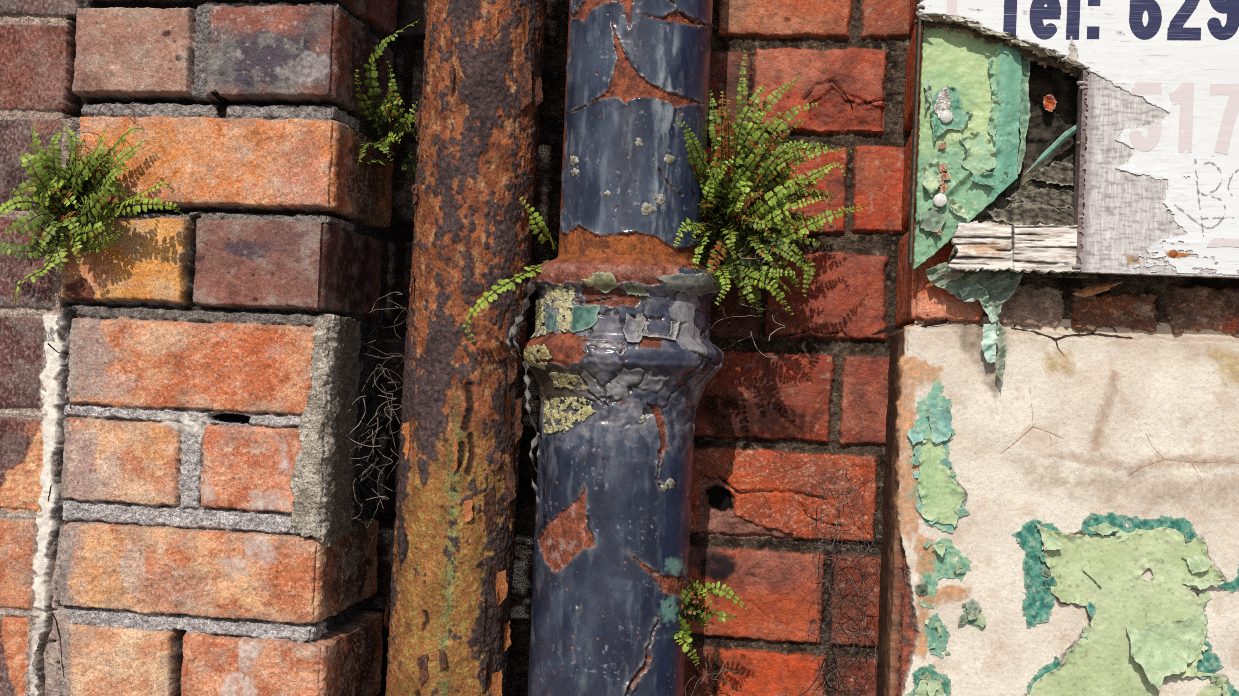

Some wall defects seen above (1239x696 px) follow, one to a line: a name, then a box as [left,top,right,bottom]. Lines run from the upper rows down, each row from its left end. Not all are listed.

peeling [572,0,706,107]
peeling [924,50,1009,188]
peeling [623,313,680,350]
peeling [926,262,1025,383]
crack [1011,327,1133,355]
crack [1000,392,1063,457]
crack [1128,434,1238,493]
peeling [537,487,596,573]
crack [718,477,843,541]
peeling [891,377,986,696]
crack [51,612,64,677]
peeling [1012,511,1239,696]